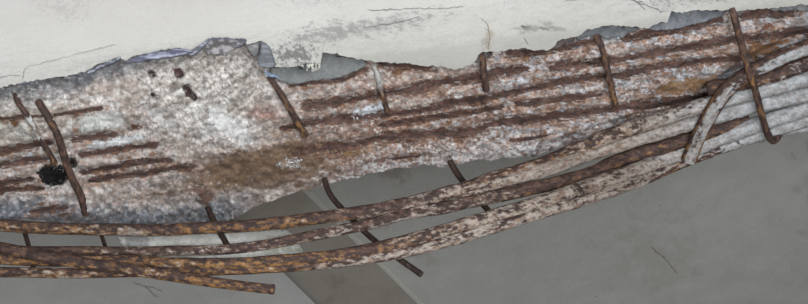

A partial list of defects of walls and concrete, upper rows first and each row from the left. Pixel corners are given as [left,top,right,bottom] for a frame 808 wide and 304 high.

corrosion [0,115,43,127]
corrosion [54,106,104,118]
spalling [0,4,808,224]
corrosion [70,9,808,204]
corrosion [0,139,53,169]
corrosion [0,176,45,195]
corrosion [29,202,70,217]